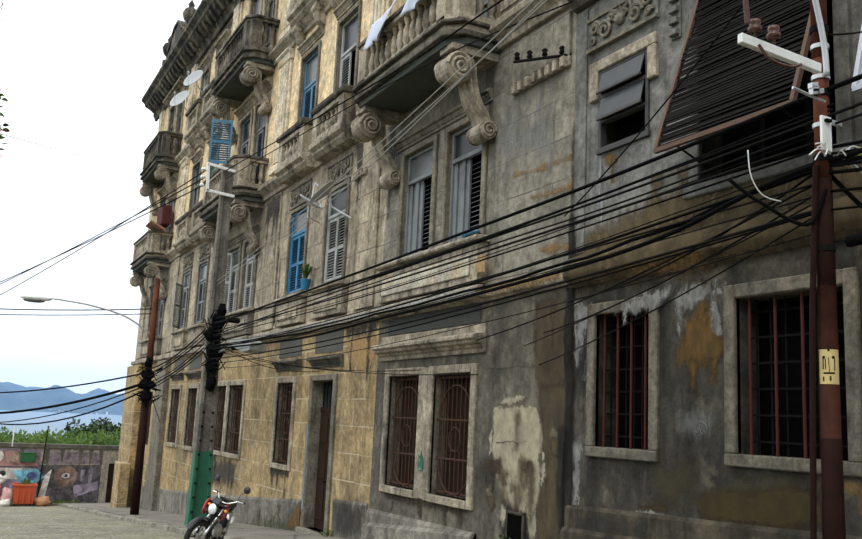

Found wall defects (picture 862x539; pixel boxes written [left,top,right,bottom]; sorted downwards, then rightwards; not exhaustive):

damp [832,156,862,236]
peeling [573,300,592,379]
damp [500,135,822,539]
peeling [486,395,558,539]